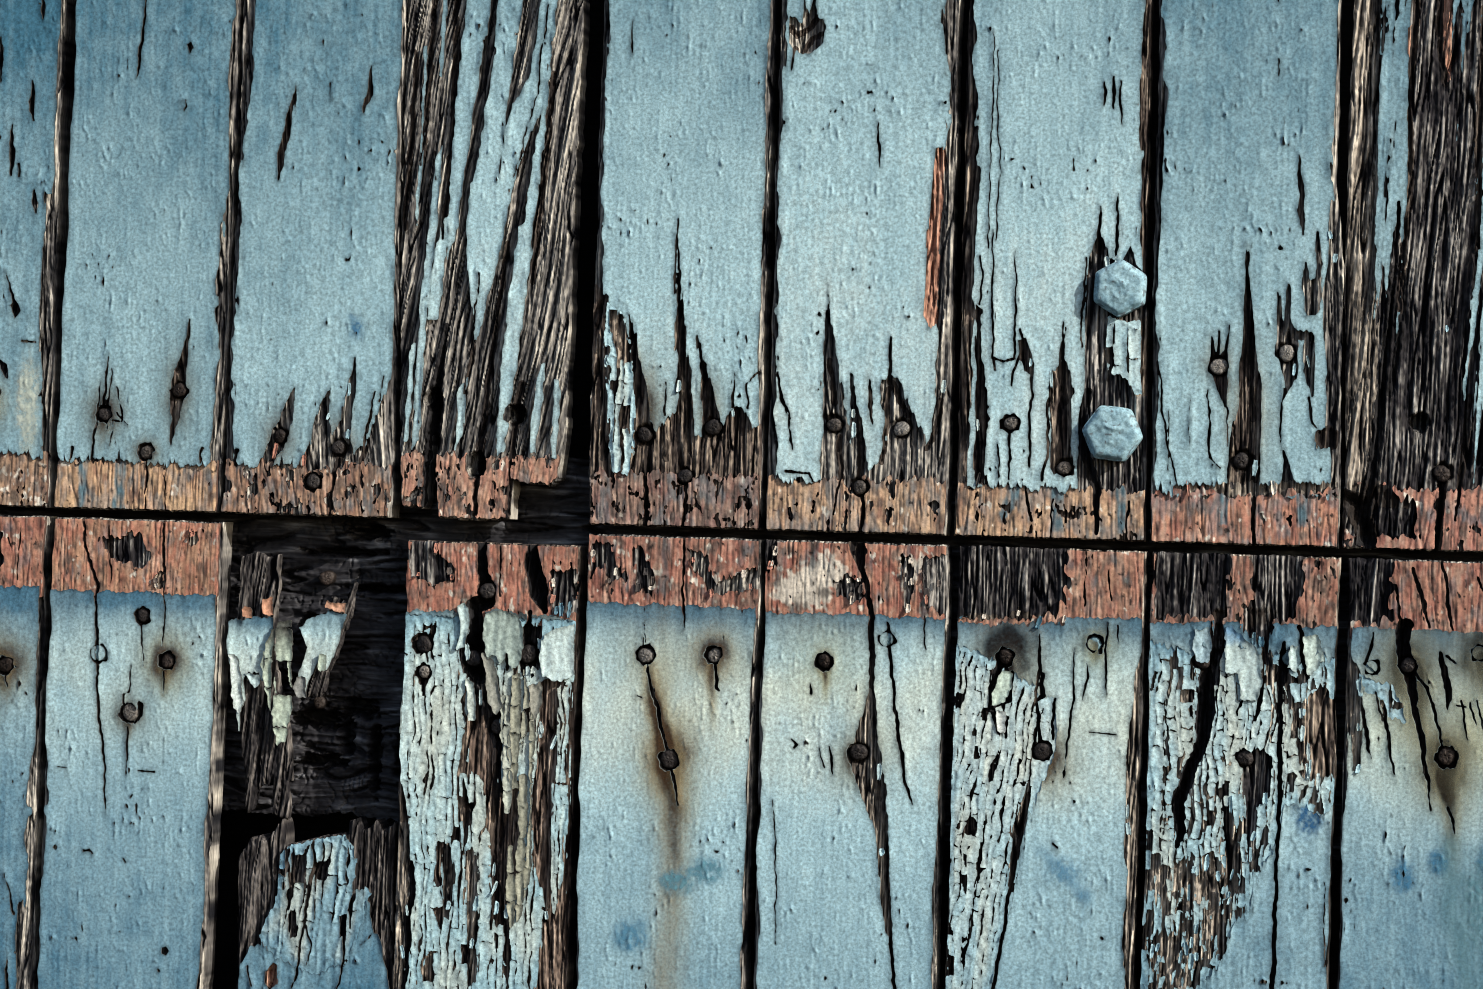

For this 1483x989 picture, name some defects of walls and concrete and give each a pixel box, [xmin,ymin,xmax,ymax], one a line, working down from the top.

peeling [289,0,584,521]
peeling [1174,0,1483,509]
peeling [549,218,779,618]
crack [603,0,1483,989]
corrosion [150,642,186,683]
peeling [228,619,327,745]
peeling [442,666,577,989]
corrosion [646,668,695,906]
corrosion [696,635,731,697]
peeling [1124,690,1279,989]
peeling [1294,656,1364,791]
corrosion [1385,638,1472,835]